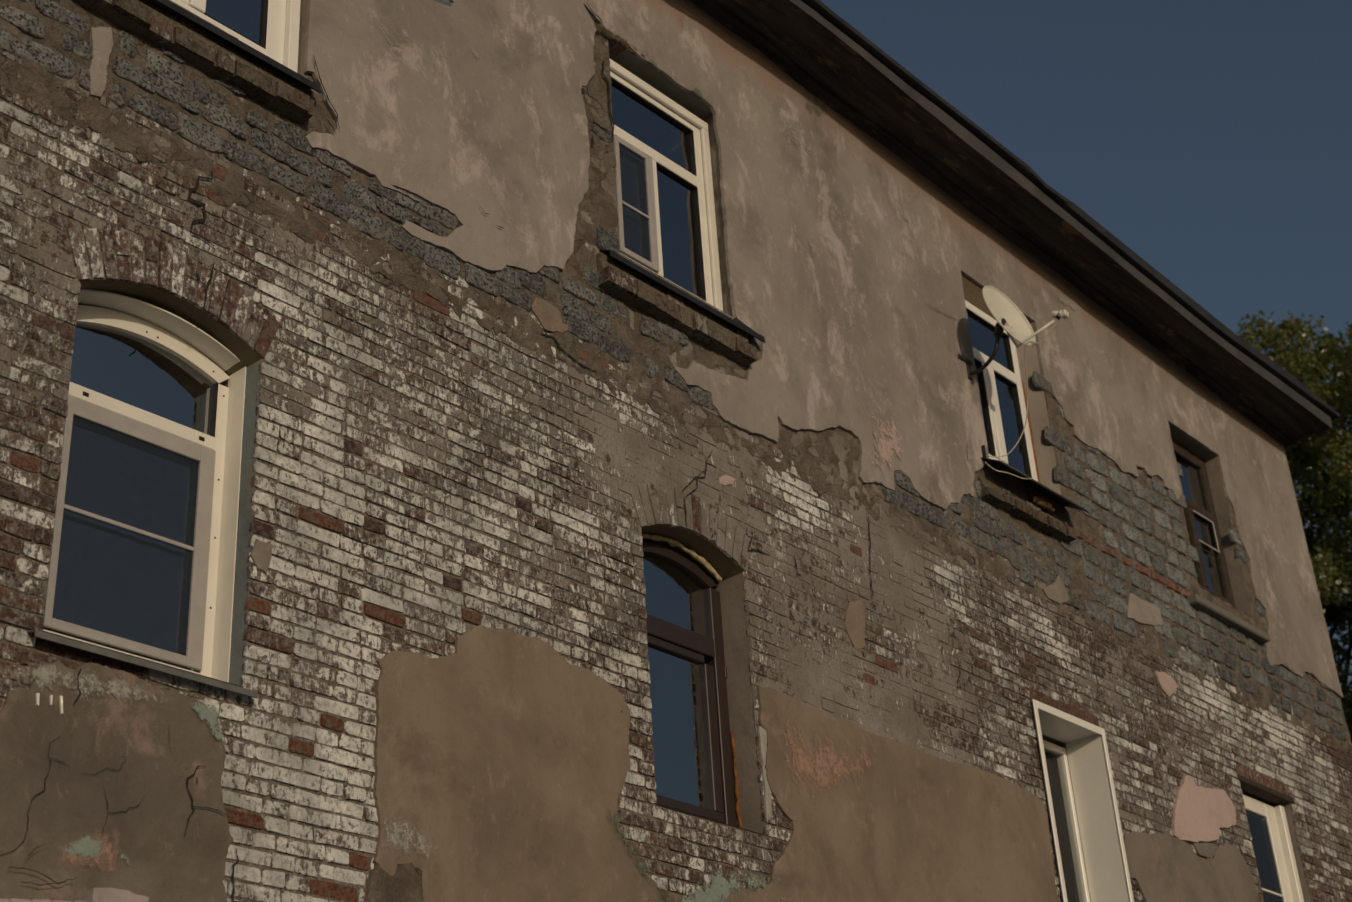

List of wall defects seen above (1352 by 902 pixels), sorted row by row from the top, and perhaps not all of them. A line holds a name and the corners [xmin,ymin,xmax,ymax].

spalling [0,0,787,476]
peeling [718,475,736,486]
spalling [783,371,1352,753]
crack [73,668,81,705]
crack [2,736,144,886]
crack [169,734,225,835]
peeling [1171,775,1236,858]